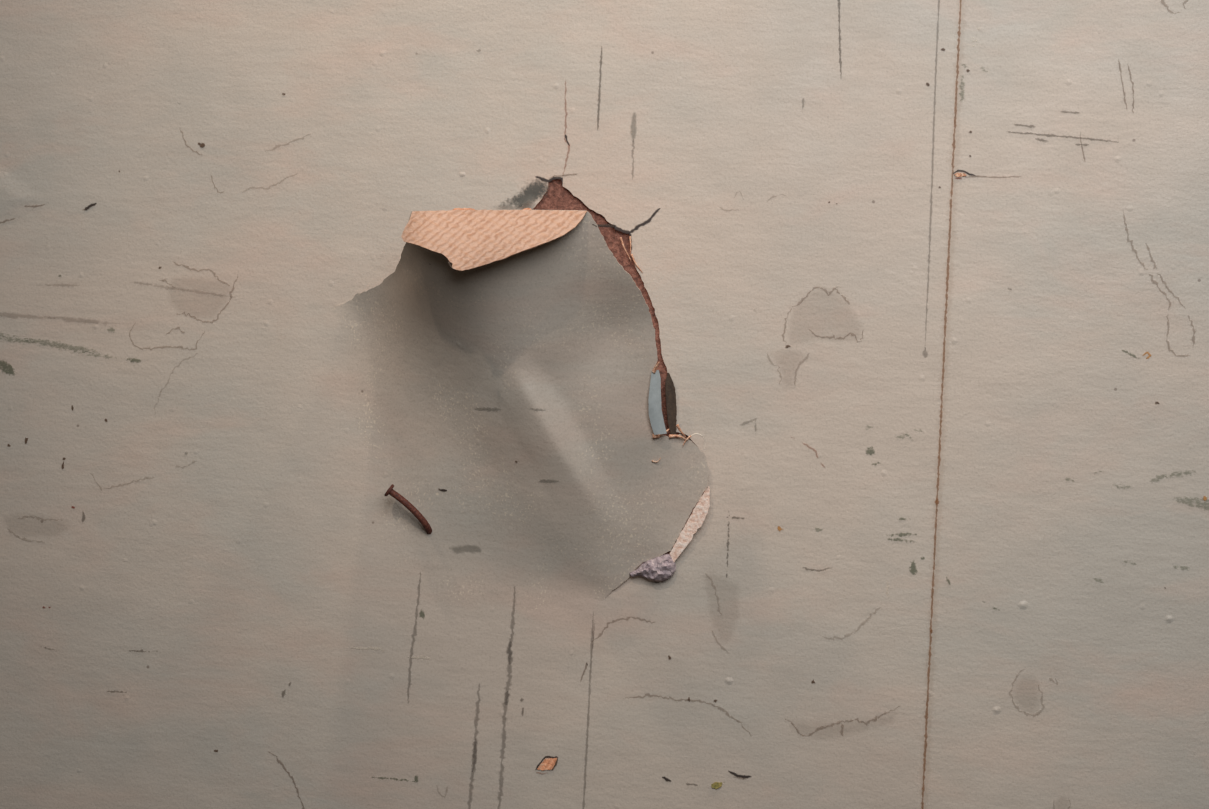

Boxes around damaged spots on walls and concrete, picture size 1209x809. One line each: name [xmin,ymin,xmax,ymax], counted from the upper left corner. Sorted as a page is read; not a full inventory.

spalling [499,182,548,209]
crack [592,208,660,250]